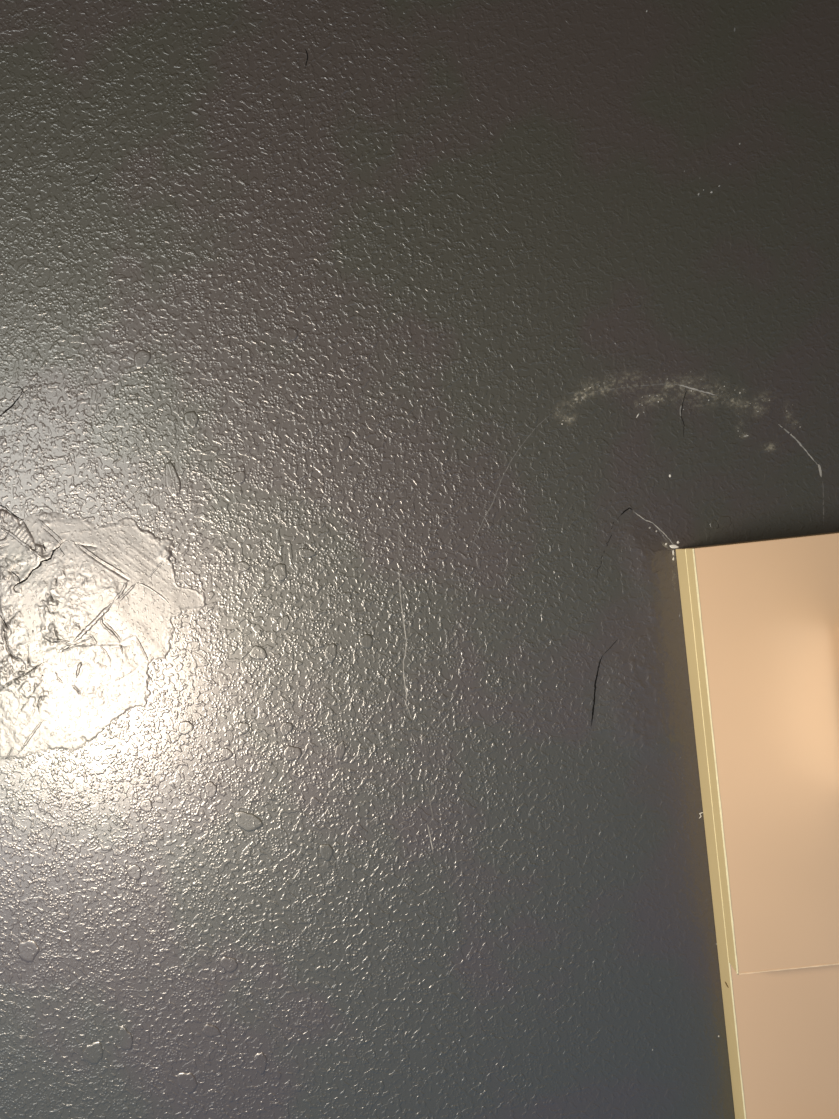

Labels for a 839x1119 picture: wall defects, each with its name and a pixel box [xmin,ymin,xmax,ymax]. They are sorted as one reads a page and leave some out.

crack [0,381,39,417]
crack [0,505,65,591]
crack [597,508,674,578]
crack [591,639,618,725]